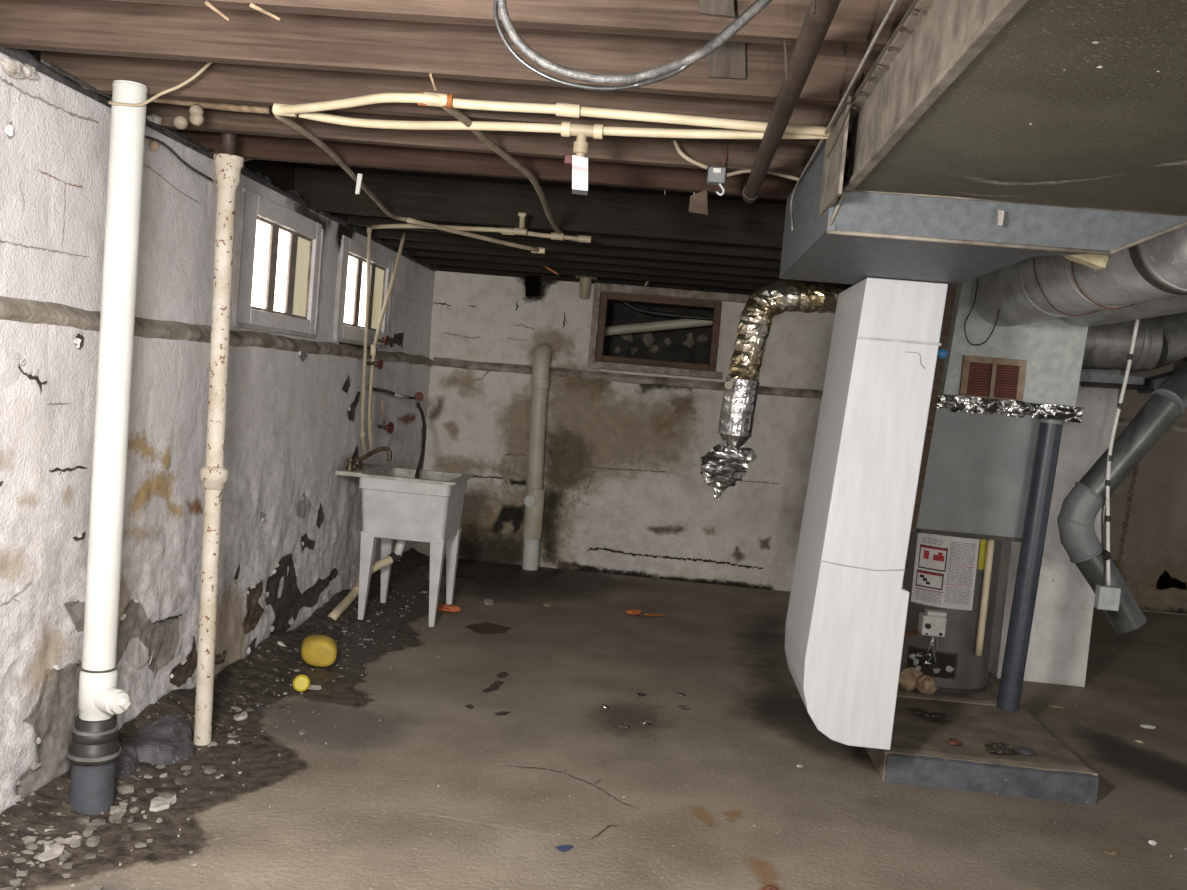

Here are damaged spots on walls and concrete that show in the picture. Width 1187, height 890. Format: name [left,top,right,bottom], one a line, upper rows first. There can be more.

crack [12,353,70,405]
peeling [64,598,85,632]
spalling [116,598,198,687]
spalling [215,649,229,665]
spalling [234,493,343,655]
damp [287,375,775,707]
crack [587,546,763,569]
peeling [15,659,82,802]
damp [20,705,307,890]
crack [506,765,643,840]